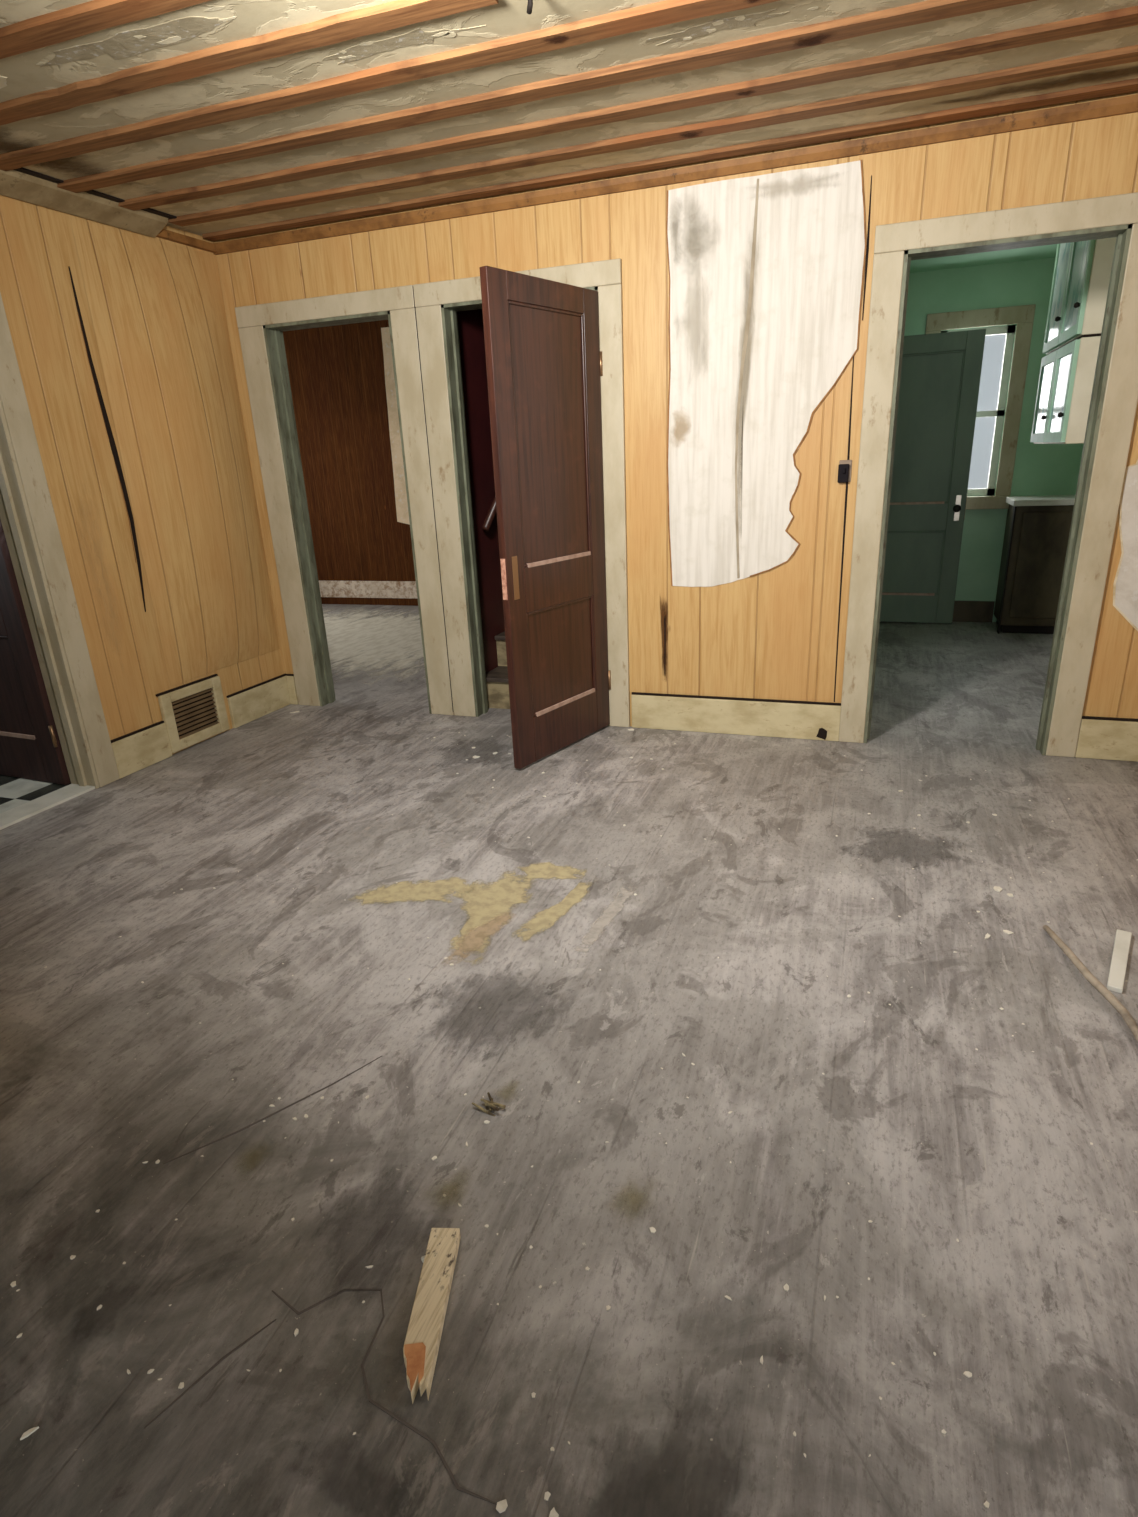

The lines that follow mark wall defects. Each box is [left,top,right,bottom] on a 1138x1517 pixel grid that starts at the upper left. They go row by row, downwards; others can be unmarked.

crack [68,266,146,612]
peeling [666,160,867,587]
peeling [1113,460,1138,631]
crack [144,1289,497,1505]